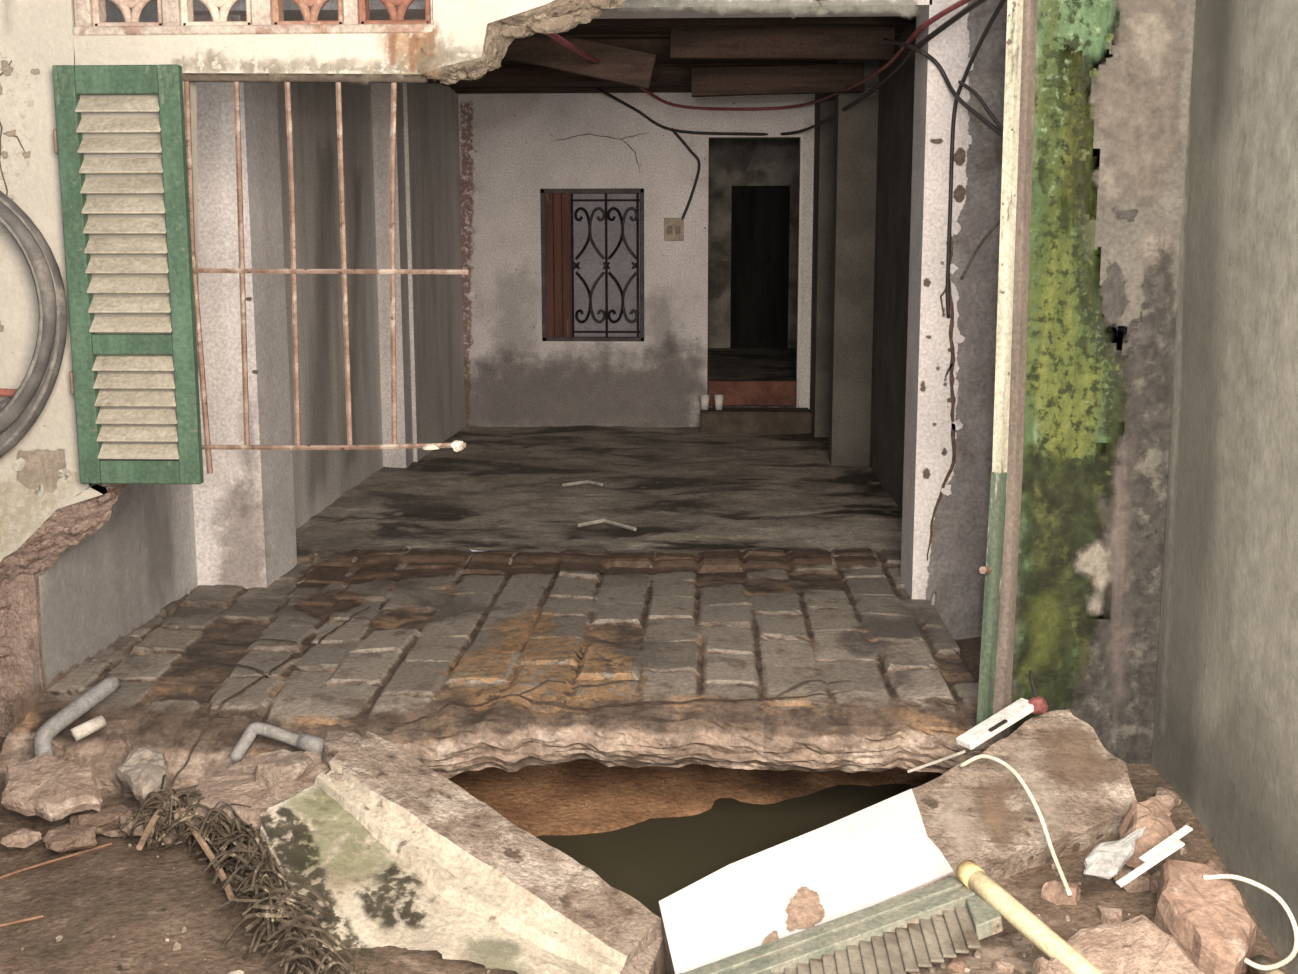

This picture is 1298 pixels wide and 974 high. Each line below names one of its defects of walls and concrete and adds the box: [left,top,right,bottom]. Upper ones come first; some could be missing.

peeling [0,60,13,94]
spalling [427,0,625,85]
peeling [1,130,30,159]
peeling [1113,207,1138,222]
peeling [460,103,479,425]
peeling [926,0,1008,641]
leakage [1061,0,1188,764]
peeling [1098,262,1156,347]
leakage [1222,0,1298,724]
peeling [13,449,72,498]
spalling [0,483,128,737]
peeling [1075,541,1112,614]